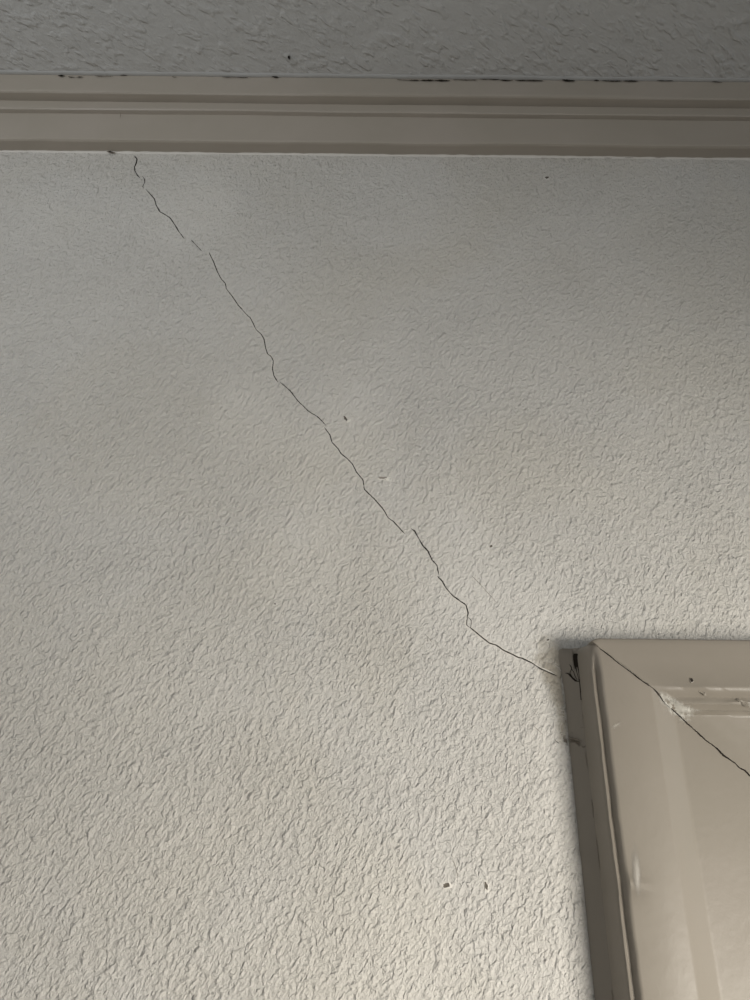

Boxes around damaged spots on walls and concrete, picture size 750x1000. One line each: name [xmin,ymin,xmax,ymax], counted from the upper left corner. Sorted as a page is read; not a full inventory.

crack [134,156,583,719]